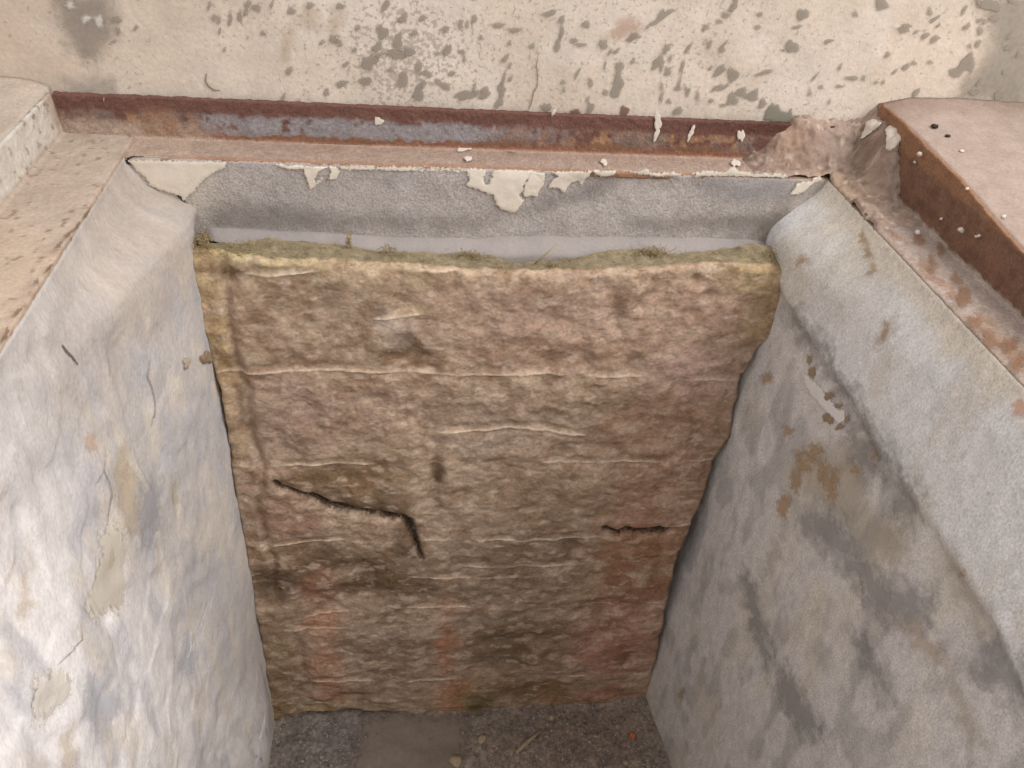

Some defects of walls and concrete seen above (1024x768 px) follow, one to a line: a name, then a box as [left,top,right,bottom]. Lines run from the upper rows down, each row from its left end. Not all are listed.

flaking render [276,163,822,213]
corrosion [777,444,858,518]
flaking render [84,519,127,620]
leakage [802,508,925,624]
flaking render [28,667,72,727]